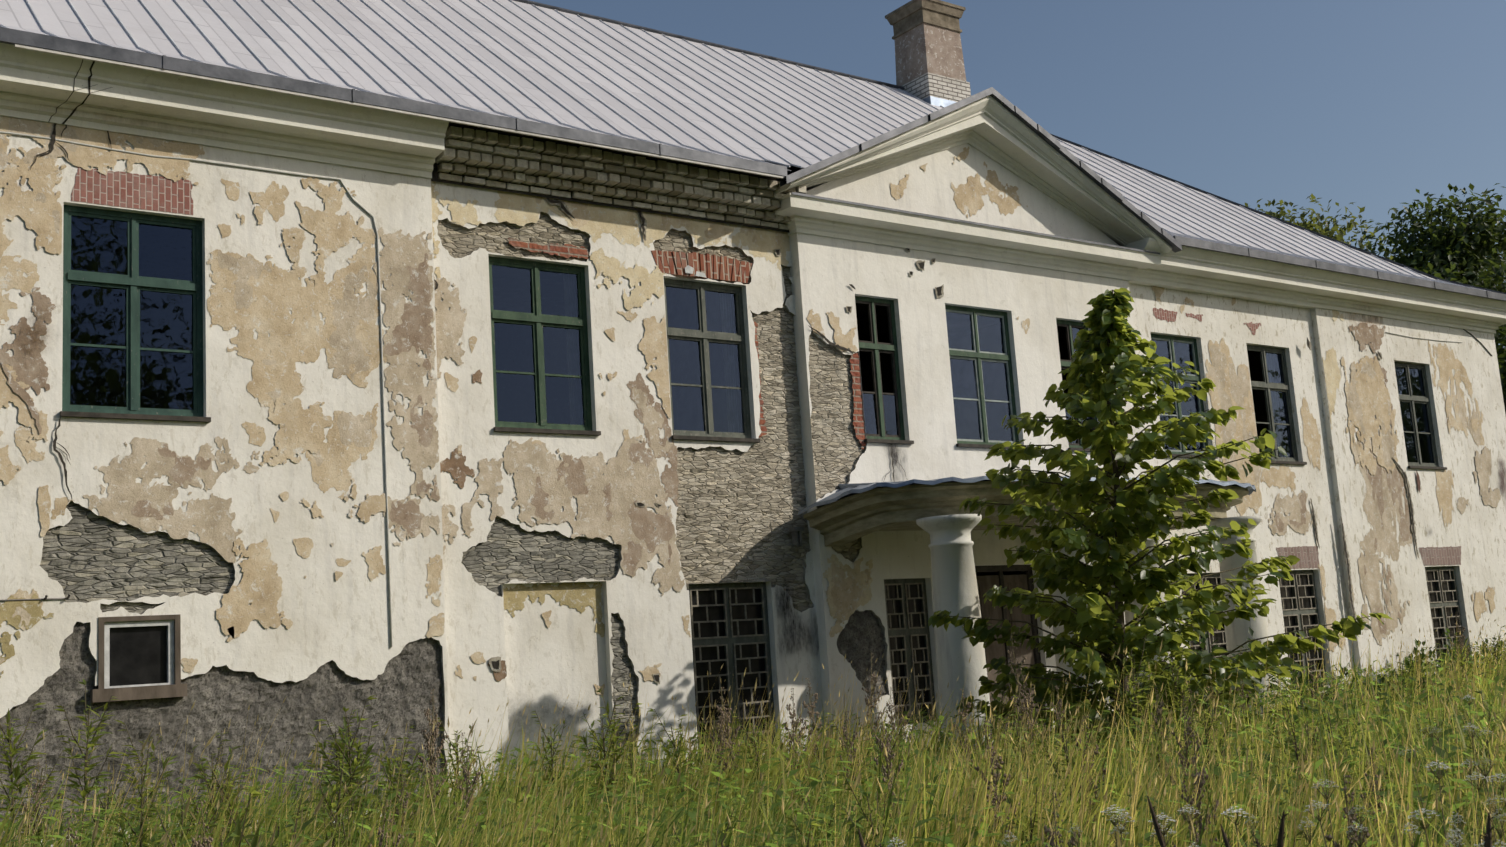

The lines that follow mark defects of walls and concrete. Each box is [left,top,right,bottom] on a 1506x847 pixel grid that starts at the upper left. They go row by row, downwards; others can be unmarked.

crack [30,60,112,169]
peeling [0,116,205,485]
flaking render [1151,286,1203,322]
crack [1,362,72,499]
spalling [0,177,889,839]
peeling [1205,338,1346,652]
peeling [1301,310,1461,645]
peeling [1428,340,1501,527]
peeling [1471,586,1495,622]